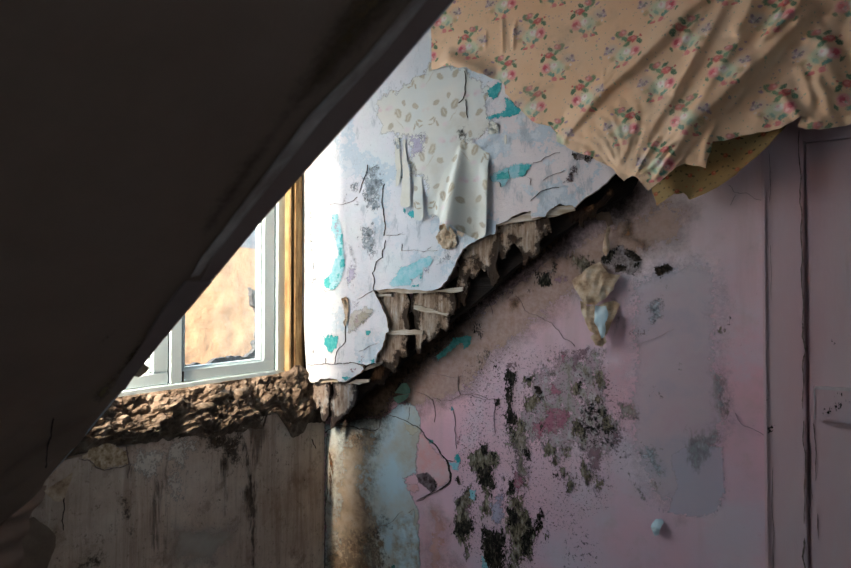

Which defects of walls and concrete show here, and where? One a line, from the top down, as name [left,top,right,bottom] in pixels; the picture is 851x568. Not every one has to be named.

peeling [341,297,349,326]
leakage [350,165,382,210]
crack [359,184,437,299]
leakage [325,188,680,568]
flaking render [572,151,593,163]
leakage [201,422,265,567]
spalling [66,365,461,568]
crack [324,369,501,568]